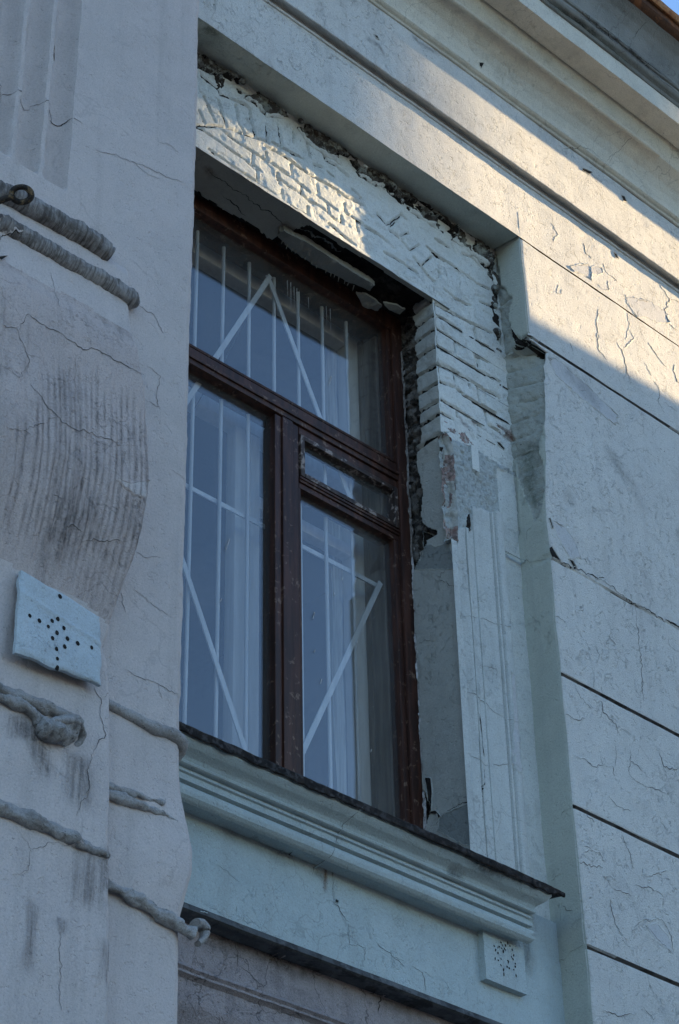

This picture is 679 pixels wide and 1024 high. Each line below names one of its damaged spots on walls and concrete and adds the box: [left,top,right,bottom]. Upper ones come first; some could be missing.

crack [2,273,161,446]
flaking render [197,52,546,360]
peeling [569,263,604,280]
crack [557,245,679,413]
peeling [408,508,453,571]
crack [505,524,679,701]
crack [565,686,679,811]
crack [313,807,433,988]
crack [552,808,674,954]